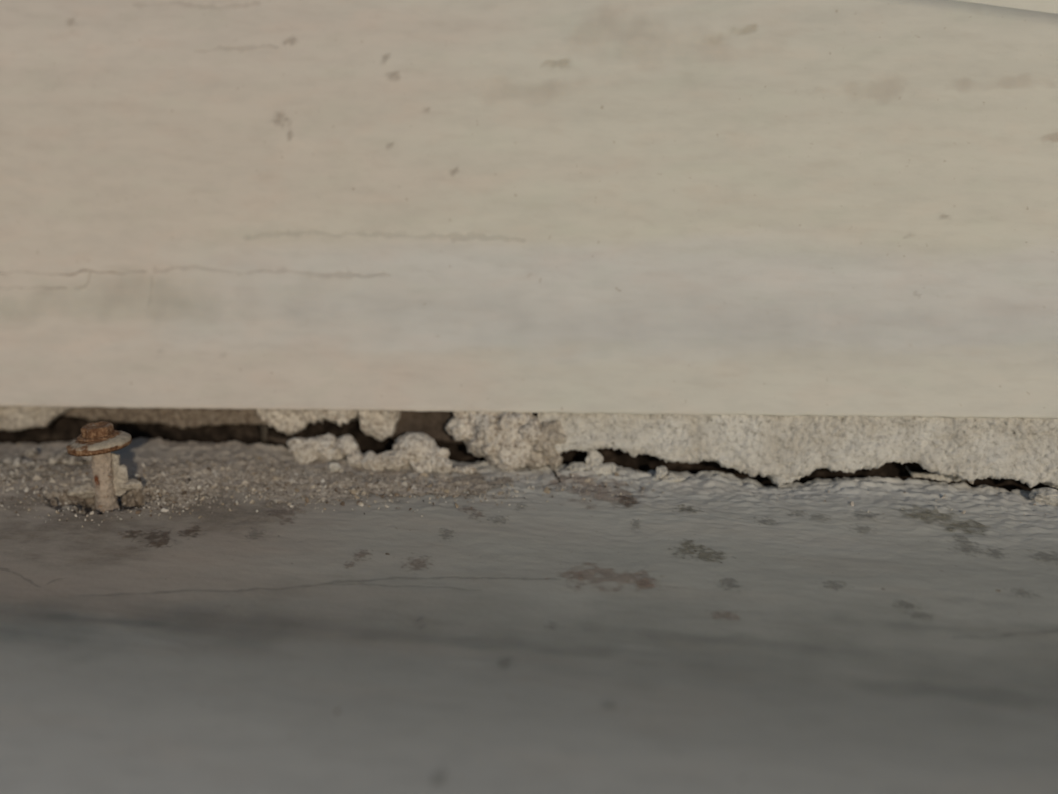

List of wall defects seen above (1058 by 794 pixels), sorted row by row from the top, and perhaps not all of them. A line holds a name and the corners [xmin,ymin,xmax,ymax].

spalling [532,412,1058,489]
spalling [116,489,157,512]